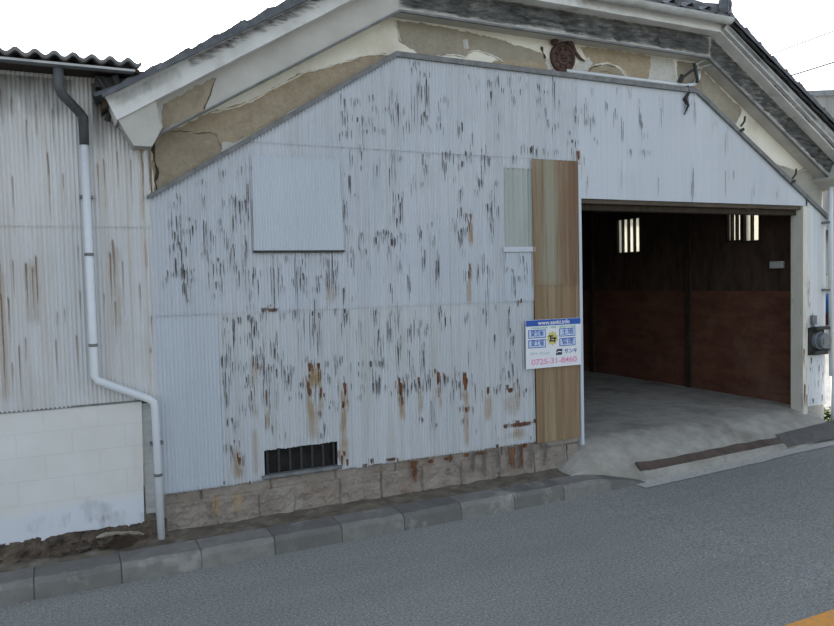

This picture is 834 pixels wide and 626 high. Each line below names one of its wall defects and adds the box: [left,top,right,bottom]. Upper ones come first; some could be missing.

peeling [395,20,555,102]
peeling [574,47,651,79]
peeling [151,53,388,191]
peeling [385,73,430,132]
peeling [442,146,490,196]
peeling [231,185,253,230]
peeling [375,166,403,261]
rust [306,361,322,400]
rust [395,375,424,405]
rust [460,372,527,412]
rust [495,419,537,430]
rust [509,441,539,467]